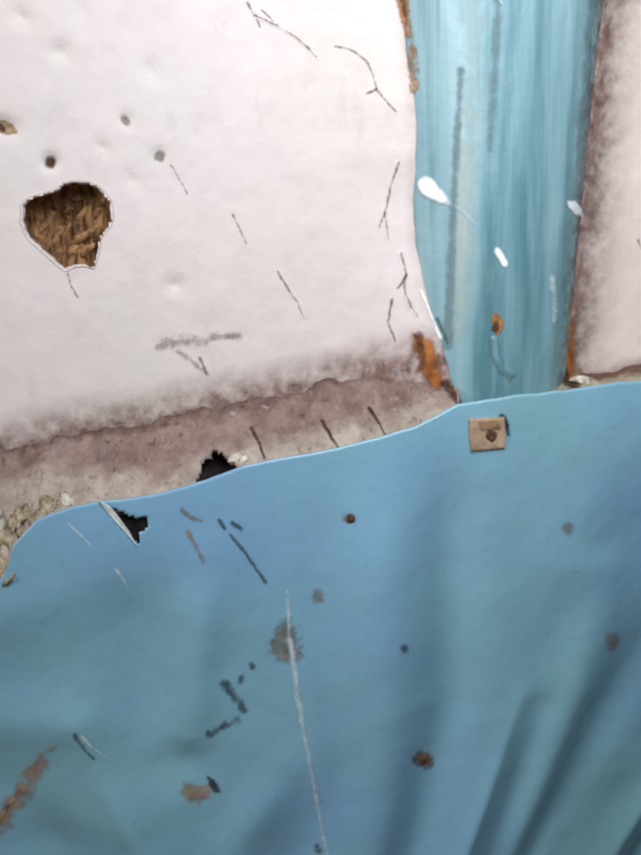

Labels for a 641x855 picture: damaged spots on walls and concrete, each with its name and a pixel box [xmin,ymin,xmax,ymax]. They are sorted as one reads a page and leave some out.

crack [247,2,320,61]
spalling [19,179,115,273]
rust [413,332,462,404]
spalling [0,491,73,591]
rust [0,759,47,827]
rust [182,776,220,801]
rust [412,750,434,770]